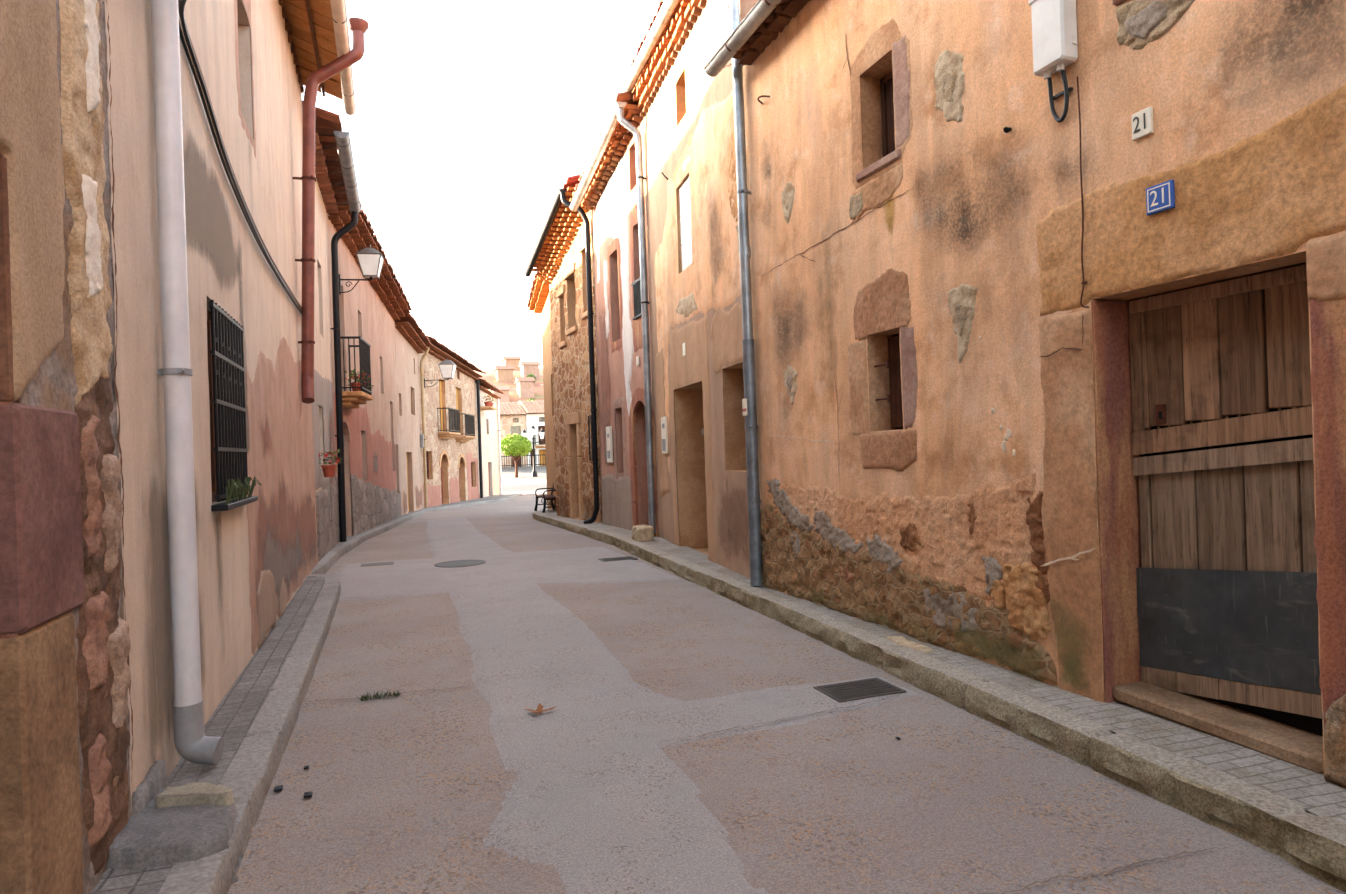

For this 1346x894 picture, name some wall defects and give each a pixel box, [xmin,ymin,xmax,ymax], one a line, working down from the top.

spalling [1115,0,1195,50]
flaking render [934,50,965,123]
flaking render [947,284,981,364]
flaking render [760,473,1058,685]